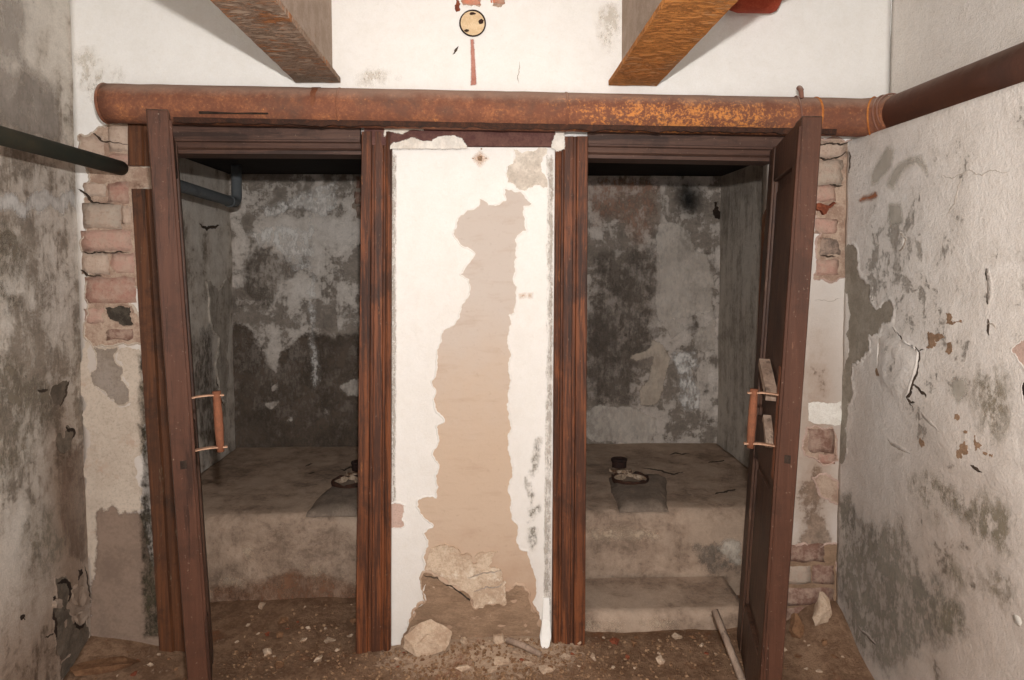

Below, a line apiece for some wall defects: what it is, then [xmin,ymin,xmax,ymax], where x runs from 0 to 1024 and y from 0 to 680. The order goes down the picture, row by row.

water stain [0,190,76,218]
flaking render [77,124,152,406]
water stain [233,183,359,449]
peeling [391,147,549,645]
water stain [587,248,658,403]
peeling [801,136,897,505]
crack [876,325,939,432]
flaking render [926,313,962,355]
flaking render [954,414,993,459]
flaking render [50,569,92,680]
water stain [838,496,964,668]
water stain [947,490,1009,548]